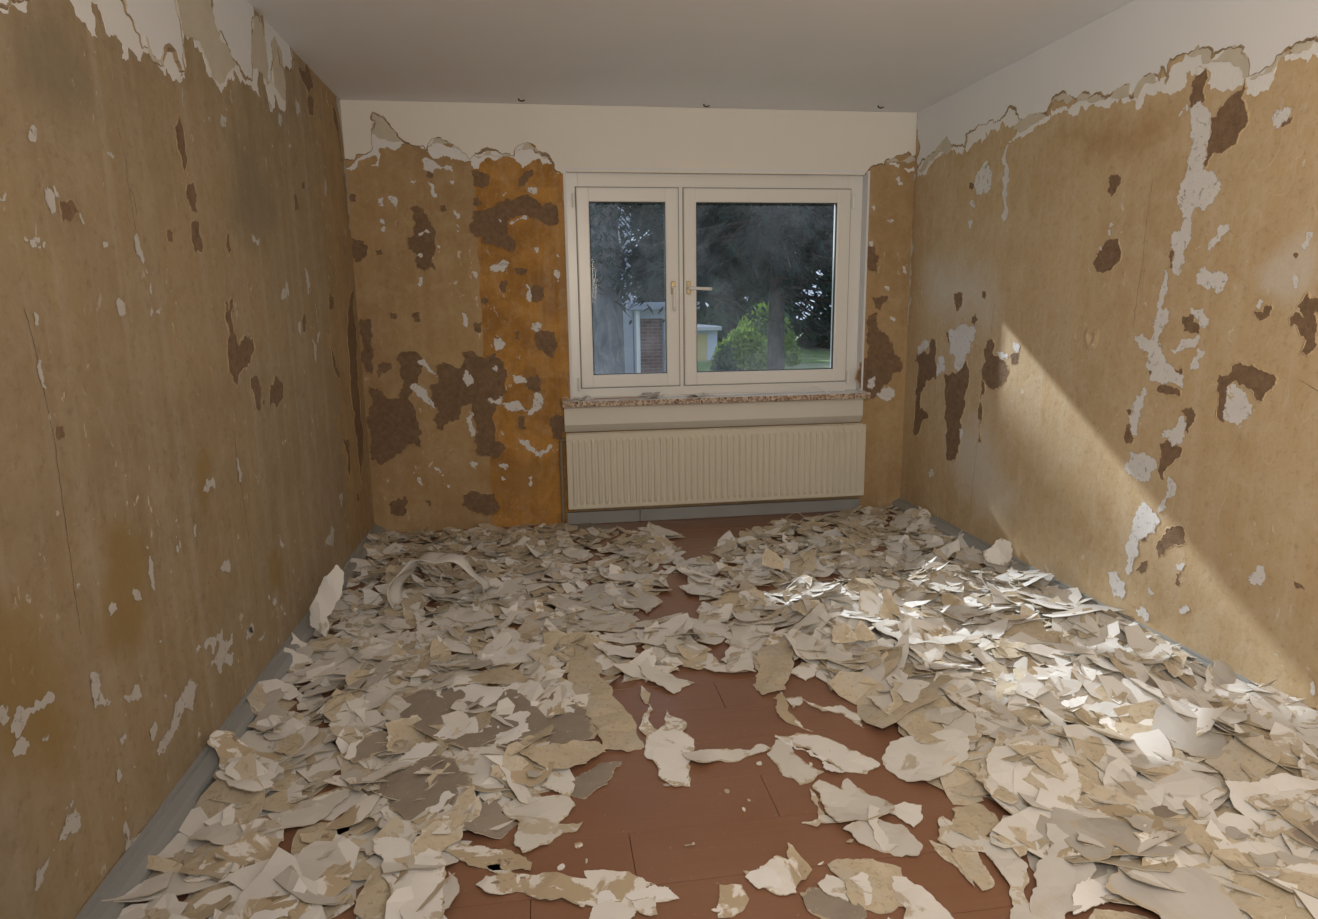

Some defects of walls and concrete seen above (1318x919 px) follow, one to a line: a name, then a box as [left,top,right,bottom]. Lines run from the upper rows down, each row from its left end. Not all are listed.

flaking render [223,296,284,413]
flaking render [324,96,383,263]
flaking render [297,289,565,517]
flaking render [378,157,560,305]
flaking render [855,233,1020,479]
peeling [1107,66,1250,622]
flaking render [1215,361,1279,428]
flaking render [1252,299,1274,322]
peeling [1272,107,1294,129]
flaking render [1288,231,1318,357]
peeling [1248,564,1267,586]
peeling [0,691,55,757]